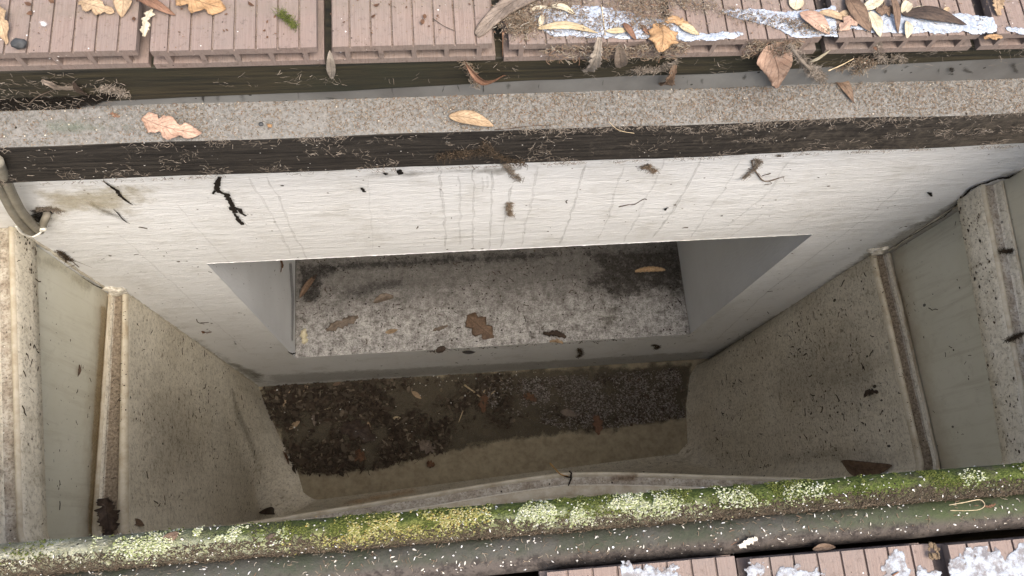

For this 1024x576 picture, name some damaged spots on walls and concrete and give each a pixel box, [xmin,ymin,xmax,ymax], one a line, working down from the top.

crack [103,181,136,224]
crack [211,175,249,225]